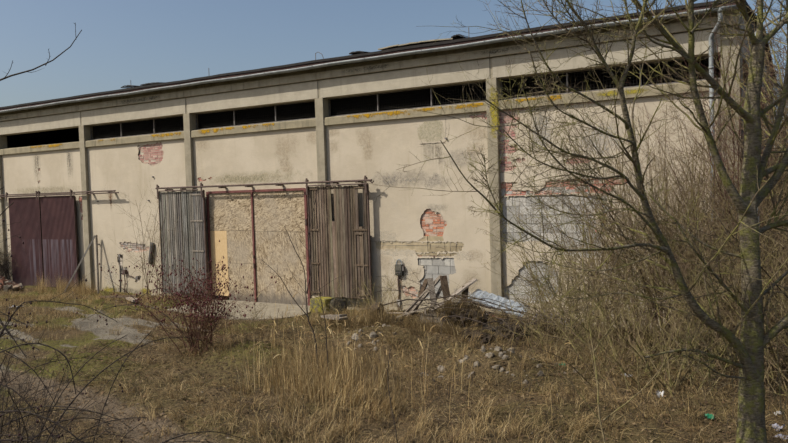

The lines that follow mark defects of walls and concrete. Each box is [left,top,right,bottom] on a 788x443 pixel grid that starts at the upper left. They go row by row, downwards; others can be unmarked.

flaking render [137,142,164,166]
flaking render [499,108,528,172]
flaking render [375,209,472,302]
flaking render [501,178,627,258]